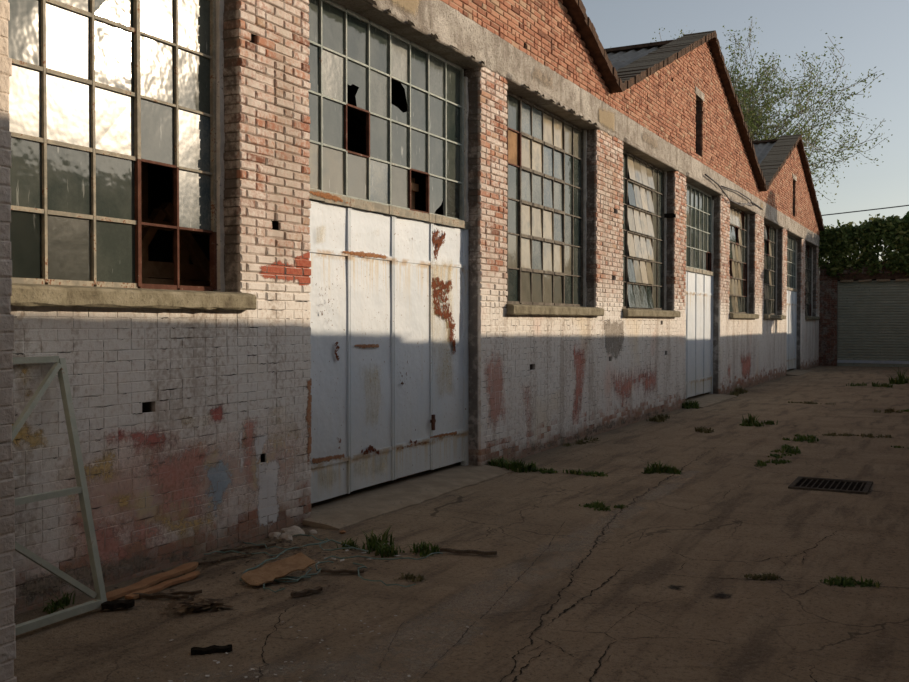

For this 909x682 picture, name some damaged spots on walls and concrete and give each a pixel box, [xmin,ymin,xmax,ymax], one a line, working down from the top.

corrosion [432,228,446,260]
peeling [260,251,311,286]
corrosion [431,277,456,354]
leakage [604,321,624,357]
crack [417,447,737,682]